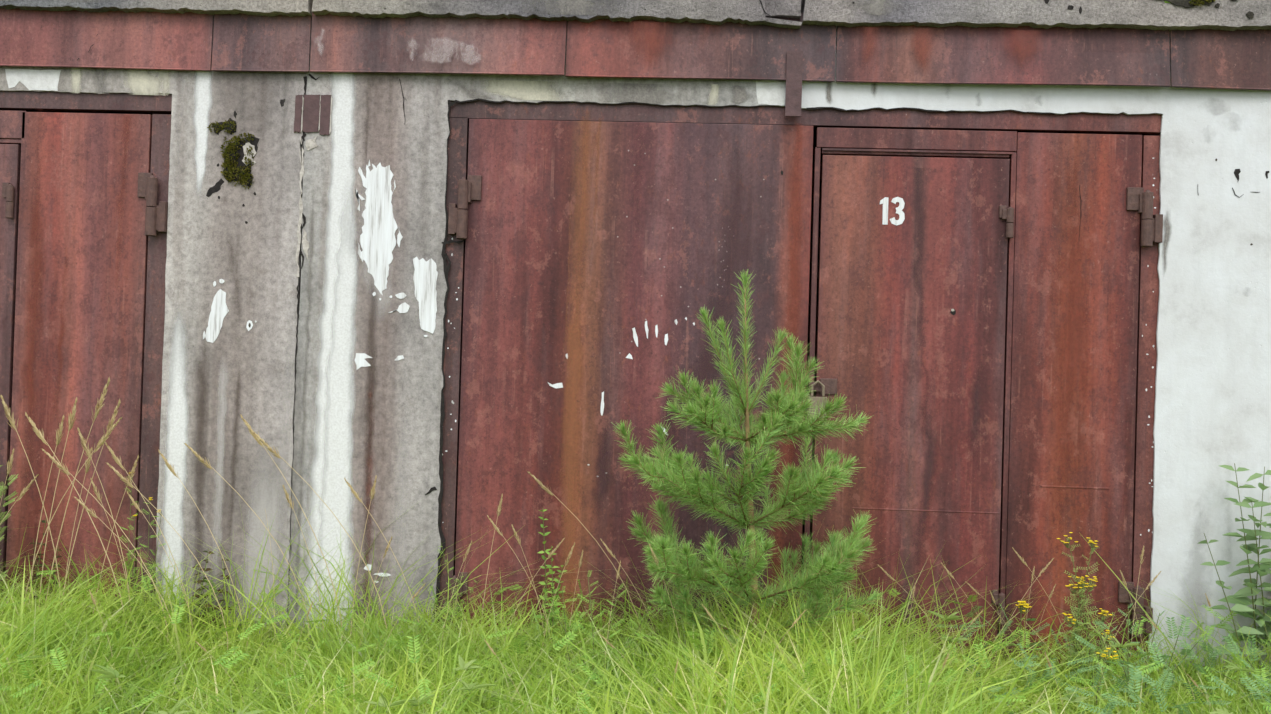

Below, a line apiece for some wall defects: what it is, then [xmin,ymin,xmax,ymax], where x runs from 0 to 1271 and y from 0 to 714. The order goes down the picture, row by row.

leakage [161,324,239,618]
peeling [203,279,229,343]
leakage [242,482,279,634]
crack [287,74,319,611]
leakage [295,73,357,634]
peeling [355,160,438,337]